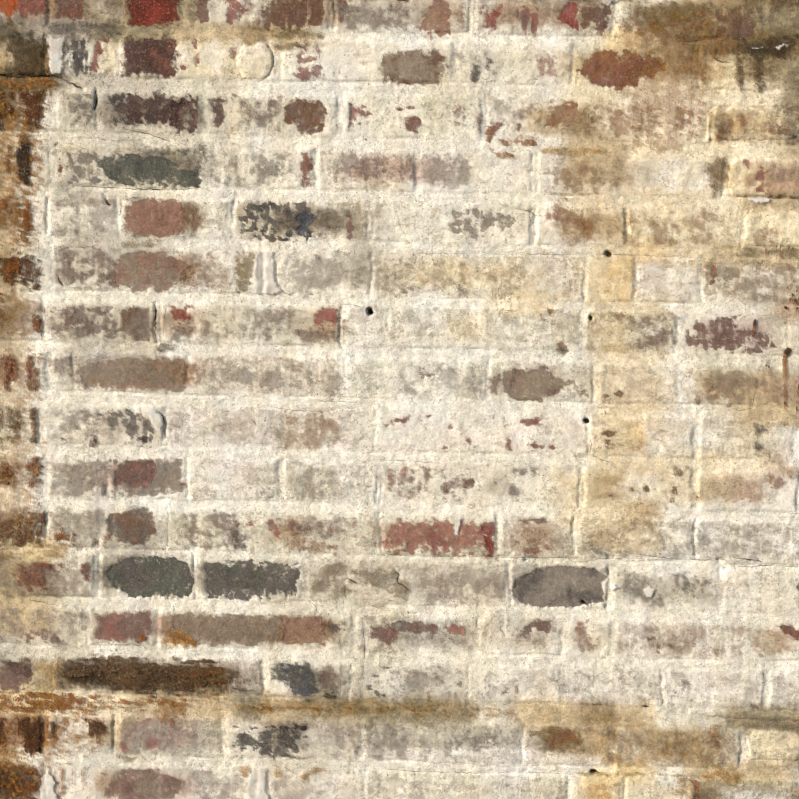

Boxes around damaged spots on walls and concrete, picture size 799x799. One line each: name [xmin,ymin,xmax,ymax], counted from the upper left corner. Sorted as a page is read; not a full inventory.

leakage [623,0,720,129]
leakage [708,34,799,94]
leakage [704,159,727,199]
leakage [748,195,770,203]
rust [782,347,791,376]
peeling [49,458,186,498]
spalling [183,510,300,601]
peeling [382,518,495,557]
spalling [107,556,194,599]
spalling [512,566,607,608]
rust [162,629,199,649]
rust [0,654,251,799]